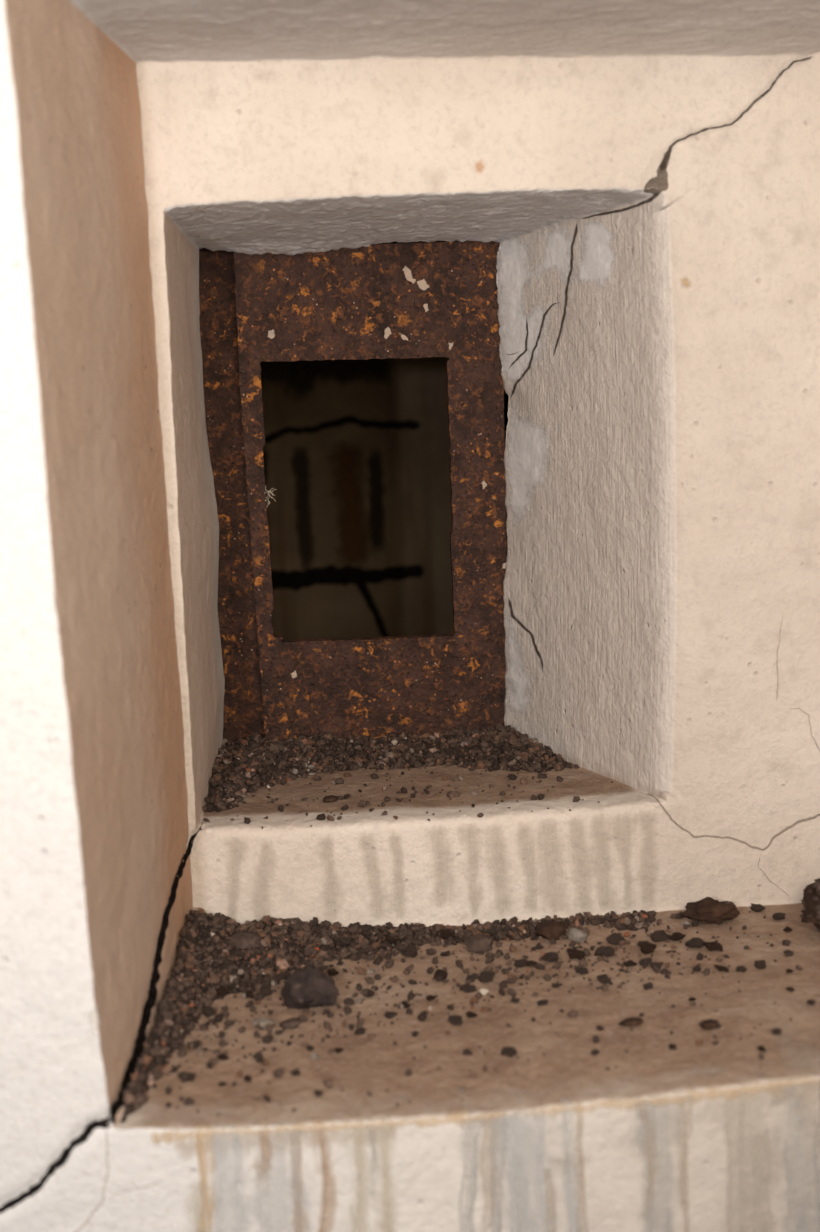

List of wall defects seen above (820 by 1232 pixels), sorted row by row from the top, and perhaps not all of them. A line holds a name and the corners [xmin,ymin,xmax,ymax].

crack [508,57,812,396]
crack [646,794,820,895]
crack [777,621,820,751]
crack [0,822,203,1232]